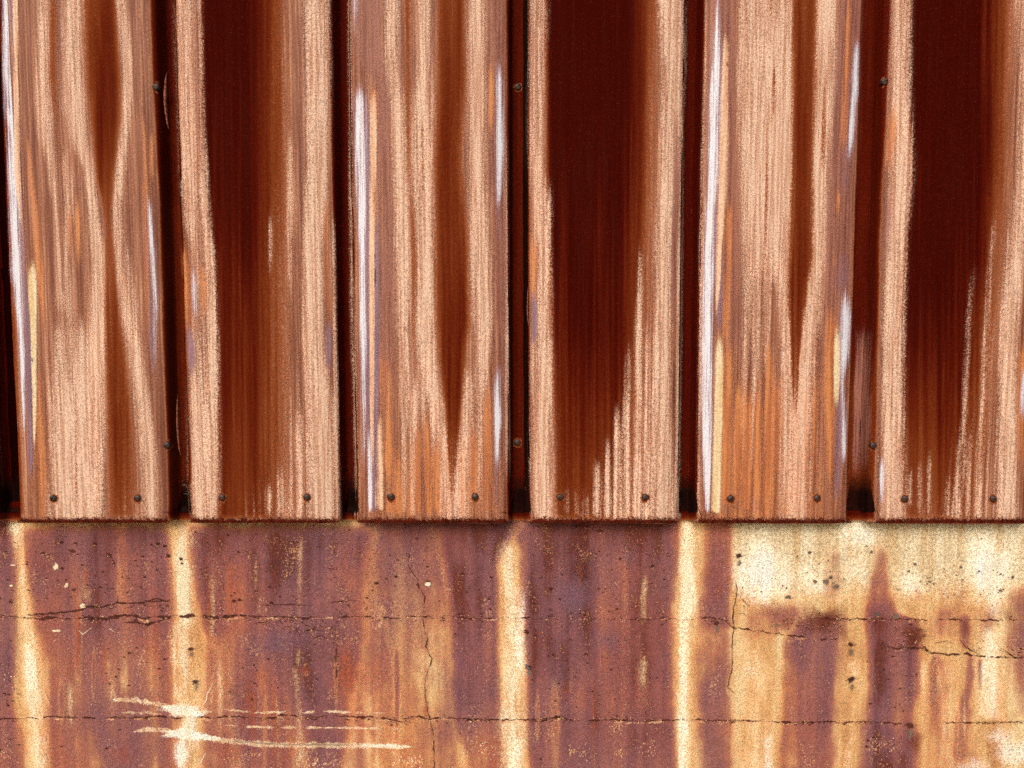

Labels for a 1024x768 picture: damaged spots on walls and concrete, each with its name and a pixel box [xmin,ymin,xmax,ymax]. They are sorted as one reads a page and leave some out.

corrosion [0,0,698,768]
corrosion [670,0,707,504]
corrosion [721,350,751,516]
corrosion [754,63,776,264]
corrosion [753,346,781,514]
corrosion [786,0,826,411]
corrosion [812,314,837,476]
corrosion [846,0,896,504]
corrosion [876,0,1024,523]
crack [0,532,1024,767]
corrosion [694,508,876,768]
corrosion [742,549,1024,768]